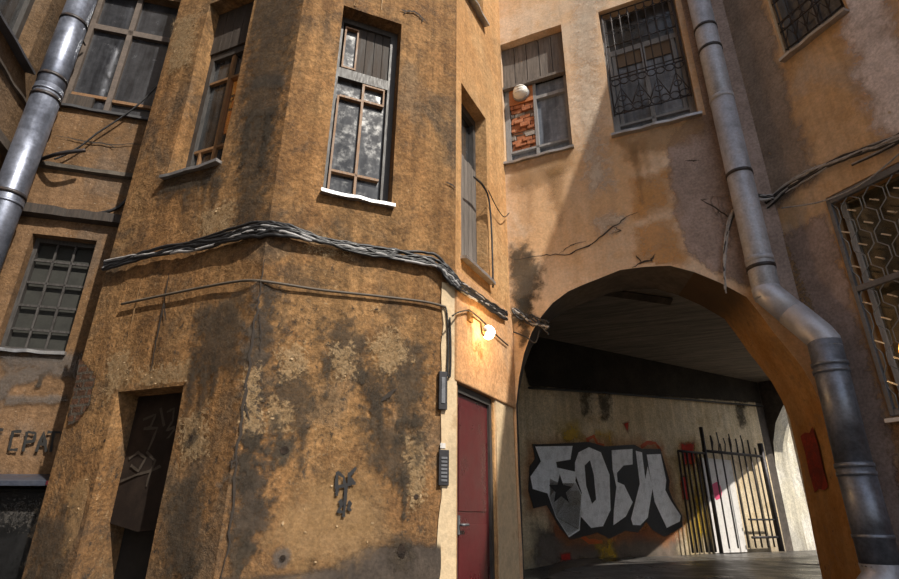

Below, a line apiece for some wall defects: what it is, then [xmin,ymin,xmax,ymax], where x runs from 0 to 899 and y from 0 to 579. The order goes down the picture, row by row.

crack [514,211,639,260]
spalling [67,347,191,425]